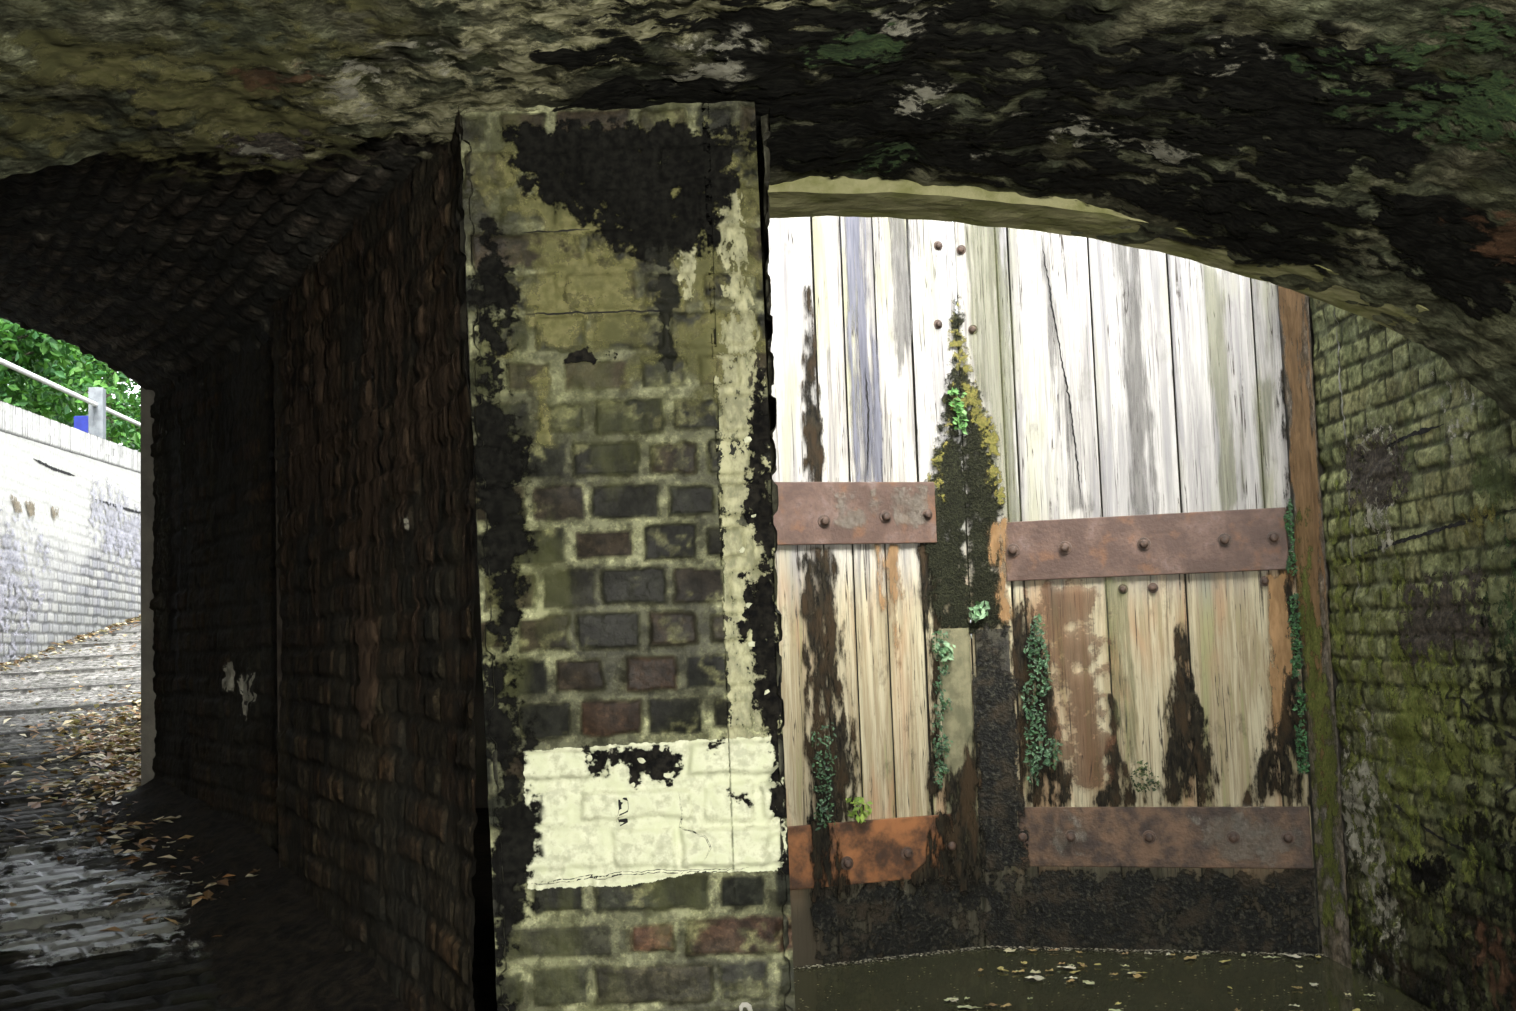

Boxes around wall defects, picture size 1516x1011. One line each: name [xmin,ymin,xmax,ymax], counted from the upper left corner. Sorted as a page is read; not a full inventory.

peeling [523,189,790,891]
water stain [250,0,1516,731]
water stain [797,217,1319,964]
water stain [1336,616,1516,1011]